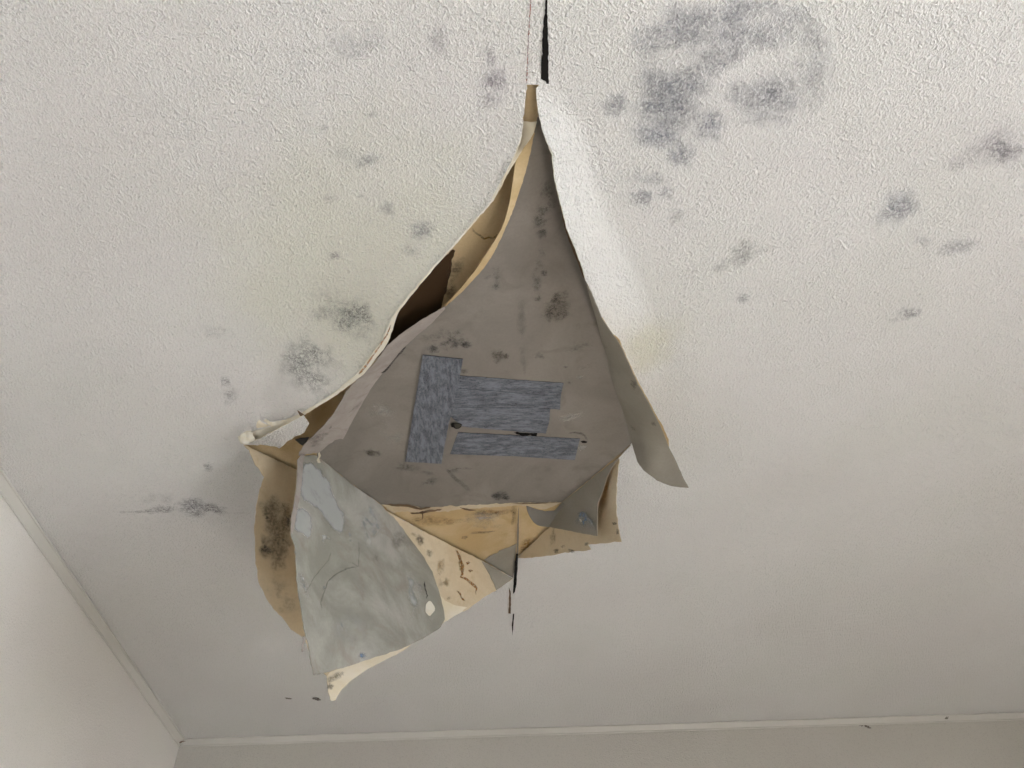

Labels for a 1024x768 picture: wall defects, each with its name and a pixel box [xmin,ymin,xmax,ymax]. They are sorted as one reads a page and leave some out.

crack [541,0,549,84]